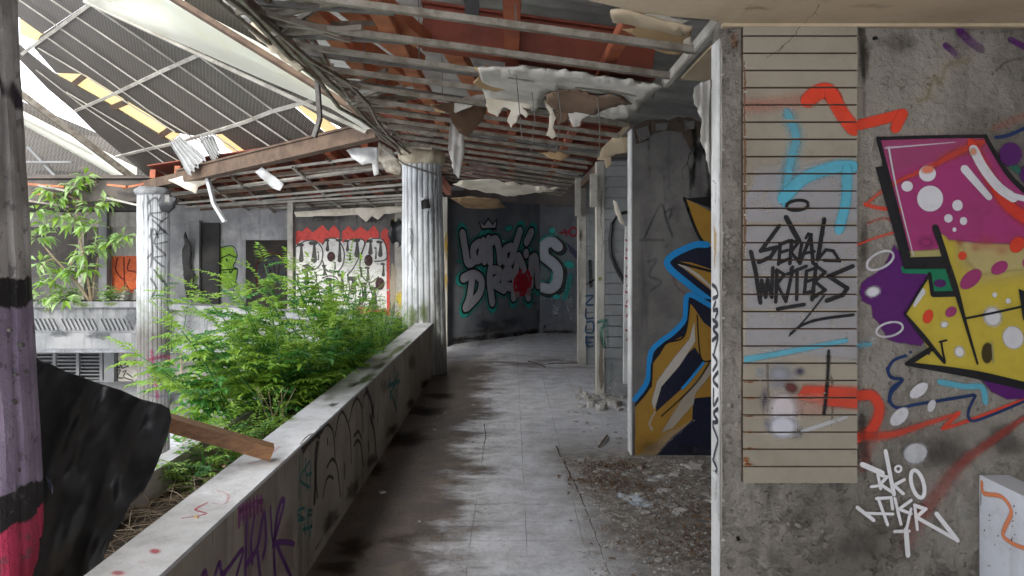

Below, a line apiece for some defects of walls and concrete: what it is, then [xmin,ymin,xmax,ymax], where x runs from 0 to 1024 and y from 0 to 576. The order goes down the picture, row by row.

spalling [634,117,702,150]
crack [555,446,608,569]